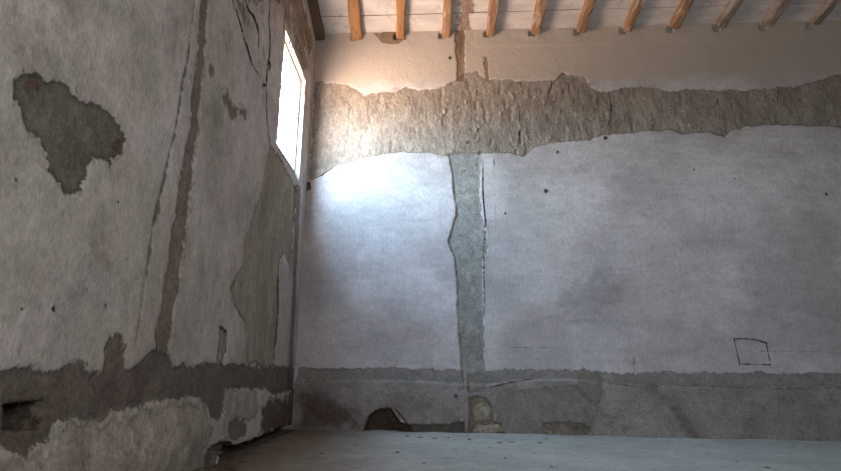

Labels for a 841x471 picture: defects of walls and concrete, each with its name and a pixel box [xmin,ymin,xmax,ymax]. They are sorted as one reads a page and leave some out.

flaking render [13,67,126,197]
flaking render [221,87,249,120]
crack [232,0,280,143]
flaking render [306,71,841,191]
flaking render [0,145,298,468]
damp [285,186,583,432]
flaking render [364,374,504,433]
flaking render [543,422,592,436]
damp [591,370,841,441]